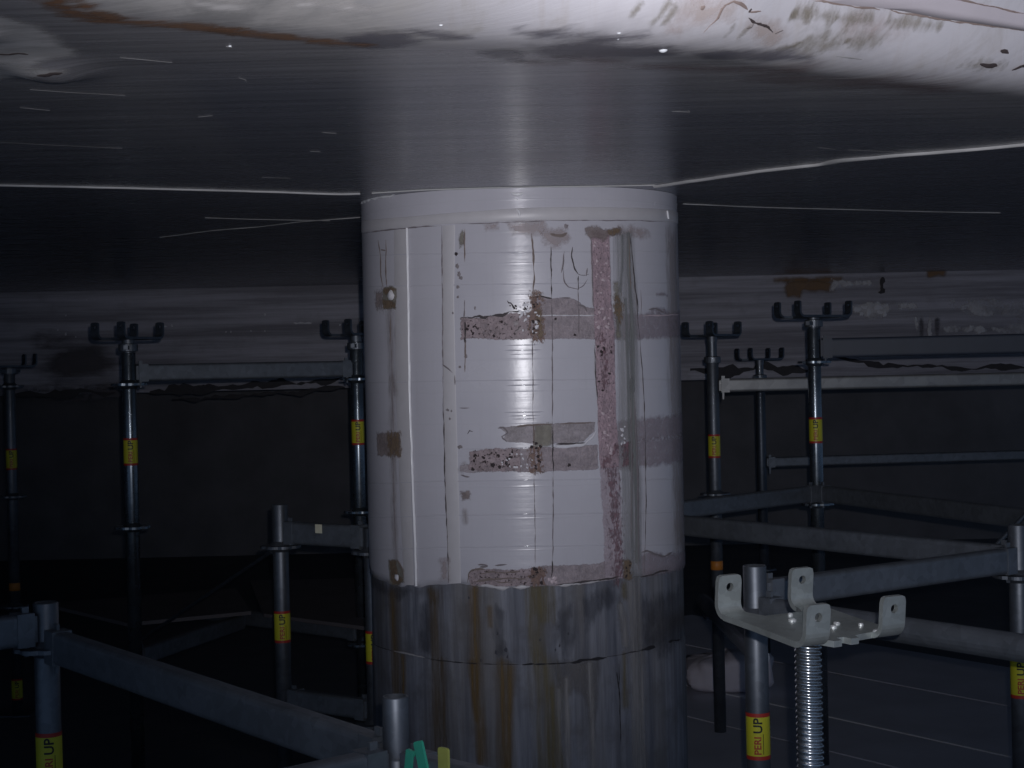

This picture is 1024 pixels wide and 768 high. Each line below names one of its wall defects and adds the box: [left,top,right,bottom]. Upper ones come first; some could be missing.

crack [700,0,783,34]
spalling [452,230,685,599]
crack [425,639,681,741]